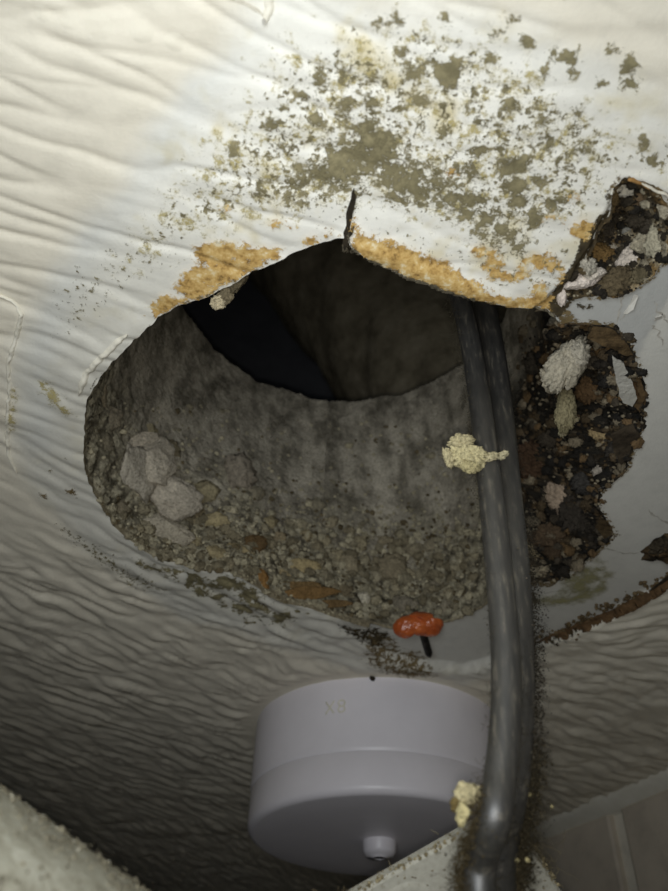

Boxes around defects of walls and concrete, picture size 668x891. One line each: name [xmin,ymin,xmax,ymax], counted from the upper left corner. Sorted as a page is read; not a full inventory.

peeling [148,239,283,319]
damp [53,8,668,334]
spalling [302,177,668,587]